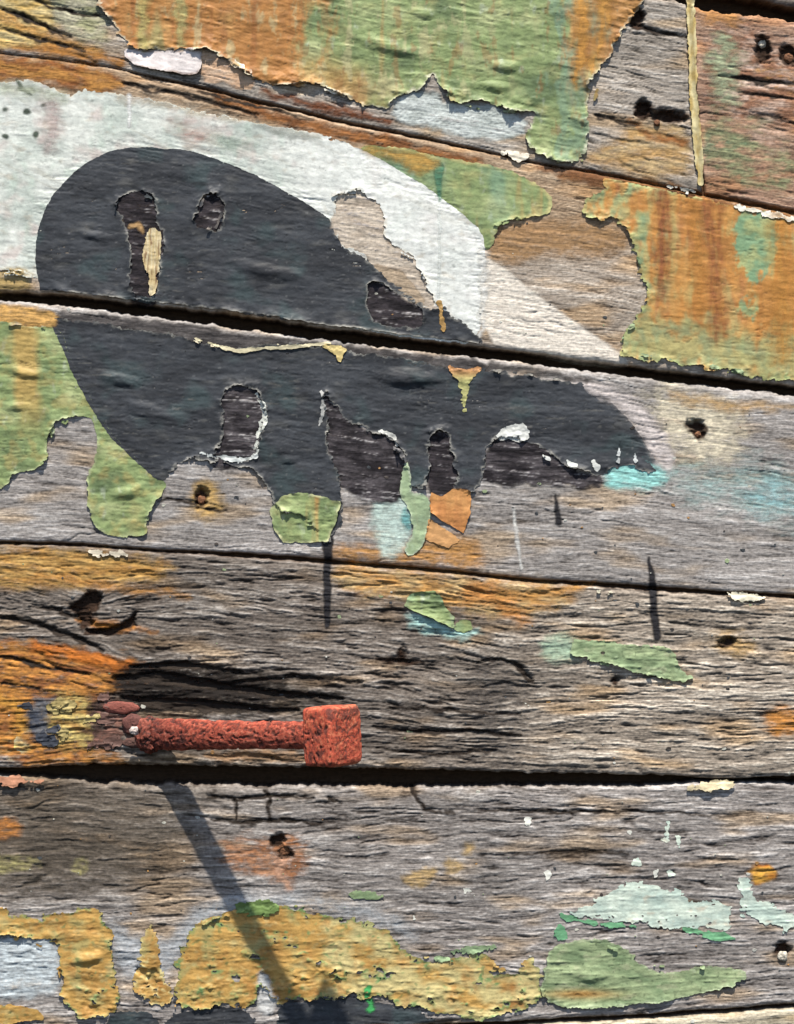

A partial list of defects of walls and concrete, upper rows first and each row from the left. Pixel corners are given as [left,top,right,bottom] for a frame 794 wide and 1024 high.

peeling [96,0,644,163]
peeling [0,76,552,344]
peeling [582,178,794,381]
peeling [0,318,661,555]
peeling [404,591,473,633]
peeling [570,639,693,682]
peeling [661,821,681,848]
peeling [0,858,794,1024]